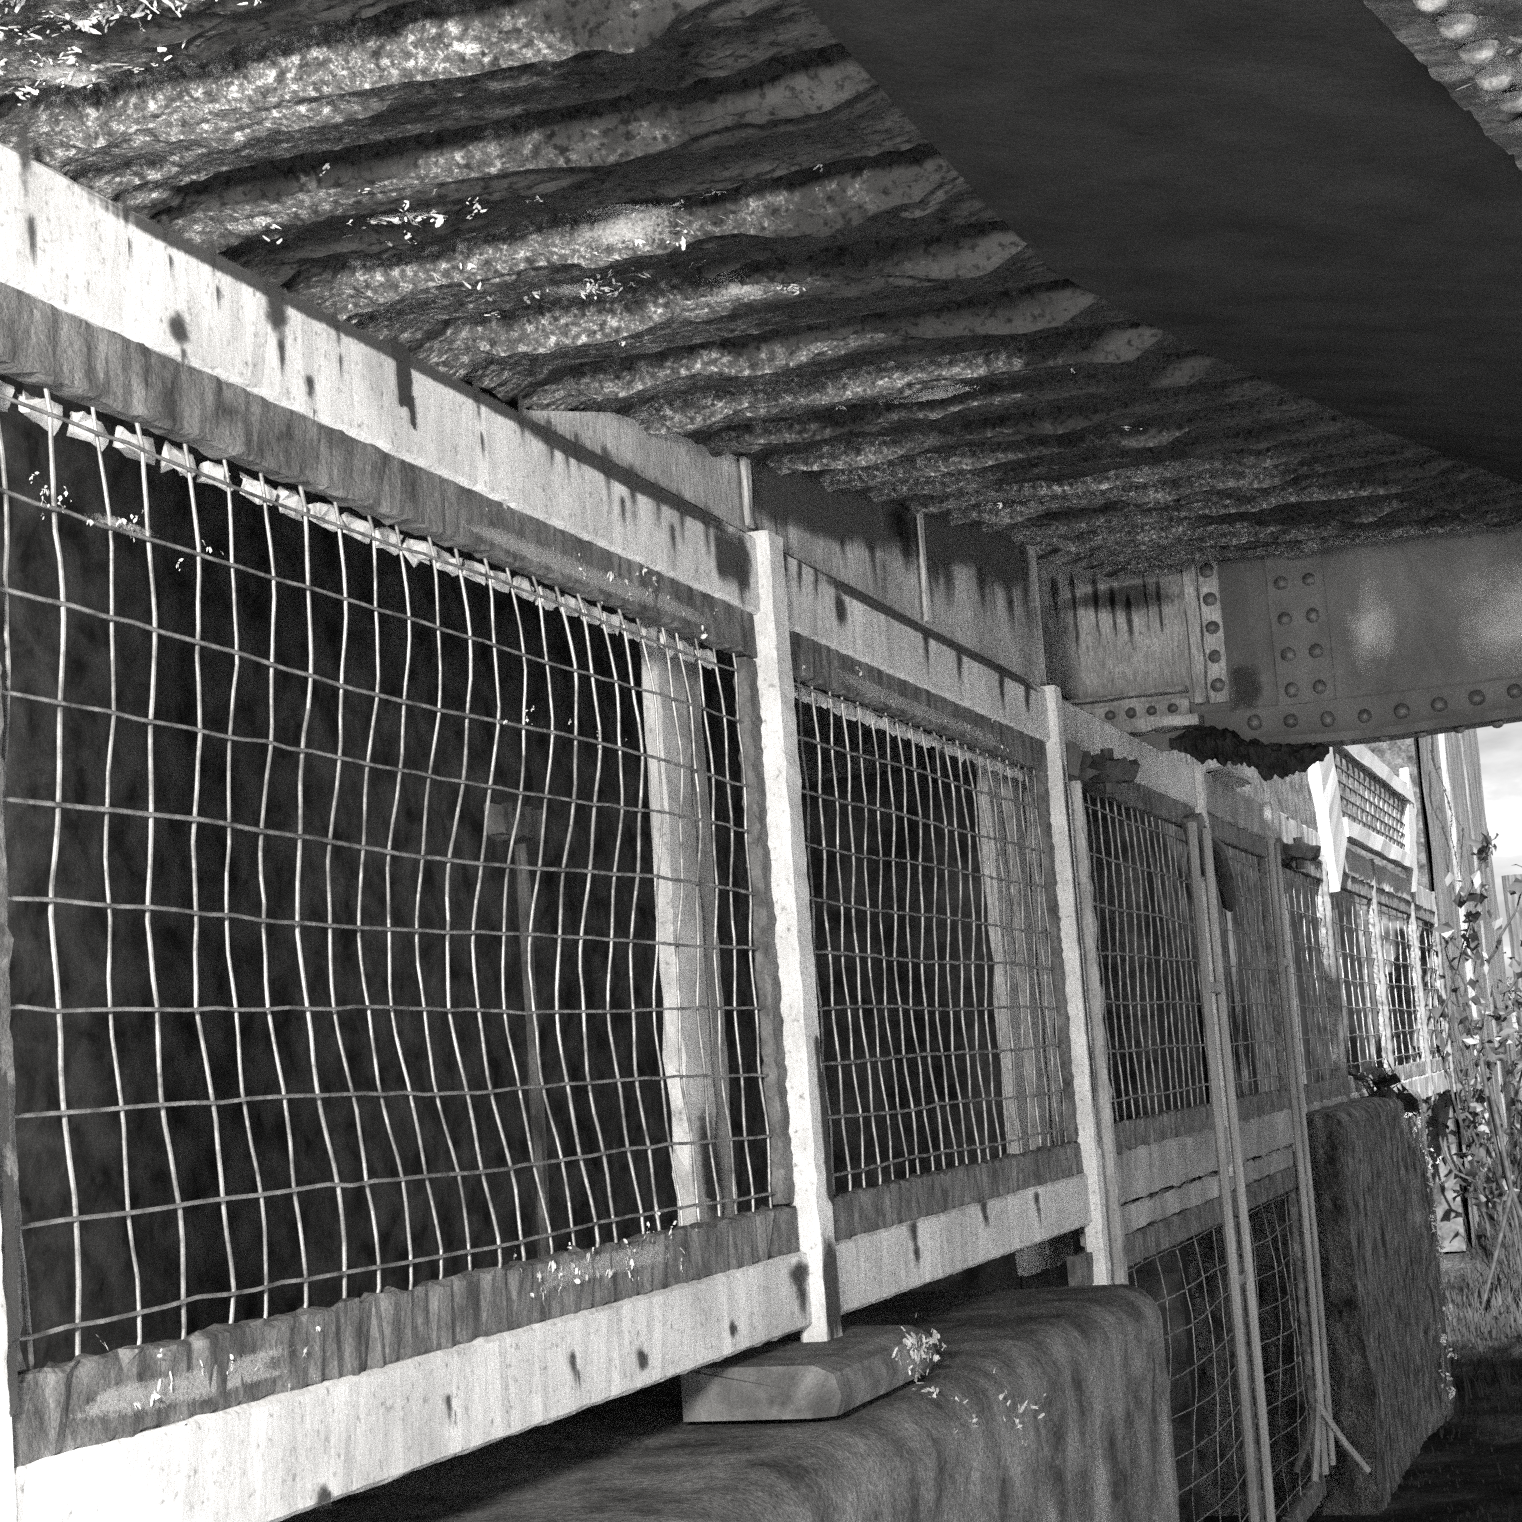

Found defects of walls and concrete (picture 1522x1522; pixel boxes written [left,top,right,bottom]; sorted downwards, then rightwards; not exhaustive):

leakage [90,192,666,490]